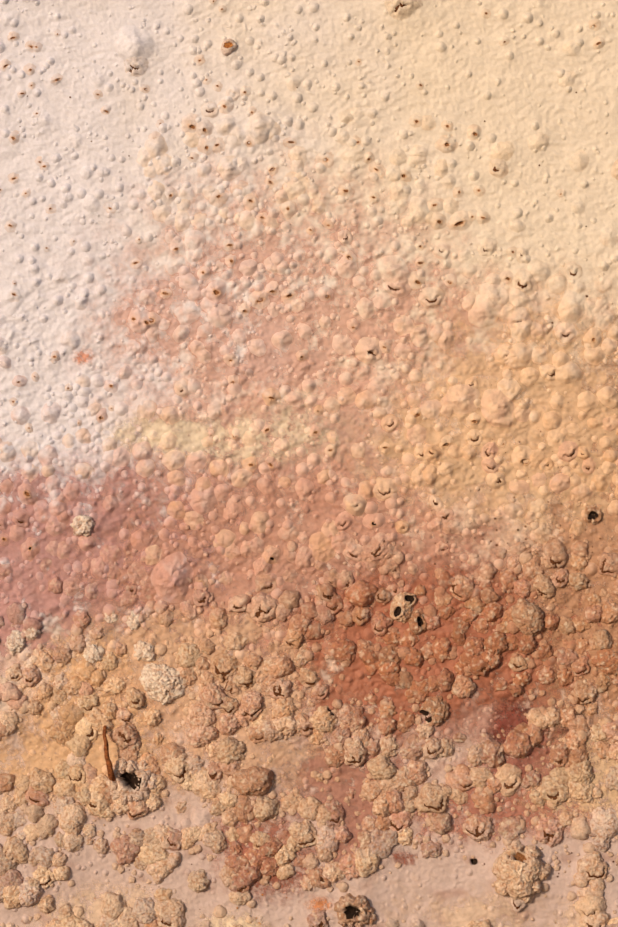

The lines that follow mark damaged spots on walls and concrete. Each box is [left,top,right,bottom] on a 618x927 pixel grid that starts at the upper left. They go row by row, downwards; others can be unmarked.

damp [0,235,618,927]
rust [295,746,380,862]
rust [291,469,618,837]